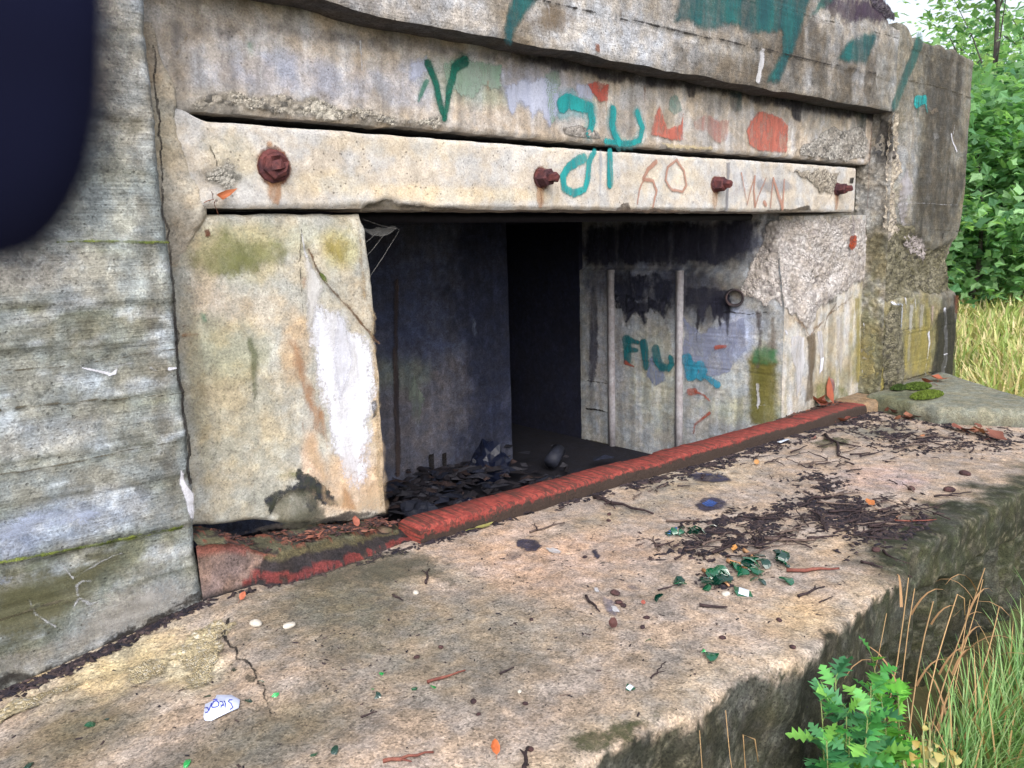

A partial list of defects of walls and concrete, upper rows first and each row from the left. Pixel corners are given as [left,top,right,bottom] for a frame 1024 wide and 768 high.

corrosion [258,142,291,204]
spalling [789,126,868,194]
spalling [616,203,690,213]
crack [299,229,379,344]
leakage [621,299,667,324]
leakage [717,298,732,326]
spalling [683,205,867,378]
leakage [785,330,824,399]
leakage [264,469,338,514]
crack [213,618,277,715]